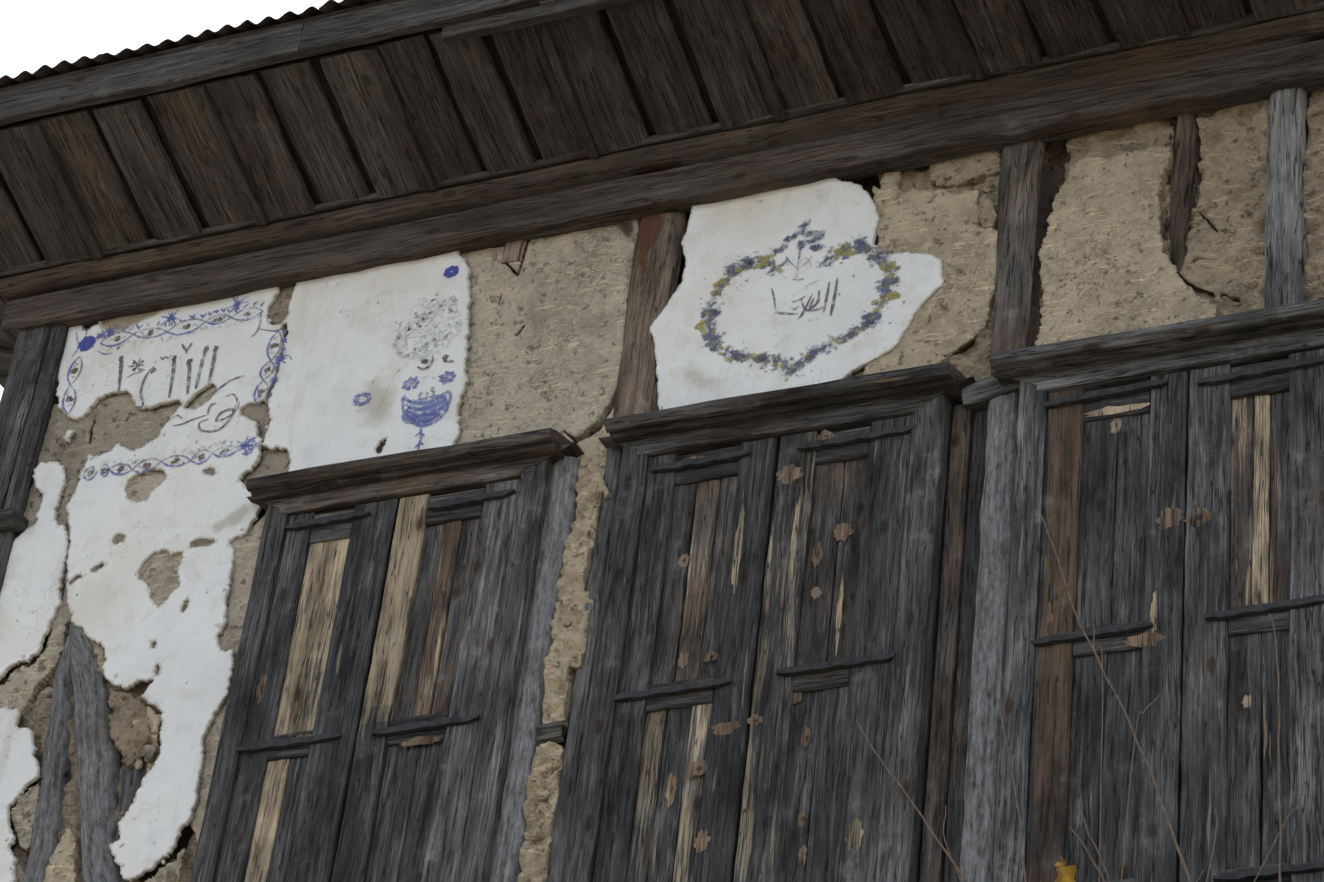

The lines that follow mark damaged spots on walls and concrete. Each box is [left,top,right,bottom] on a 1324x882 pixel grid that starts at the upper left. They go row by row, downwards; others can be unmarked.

spalling [900,162,1000,213]
crack [1162,113,1240,302]
spalling [266,286,295,330]
peeling [456,220,640,444]
spalling [948,300,995,380]
spalling [241,403,291,484]
spalling [0,385,216,882]
spalling [121,511,267,882]